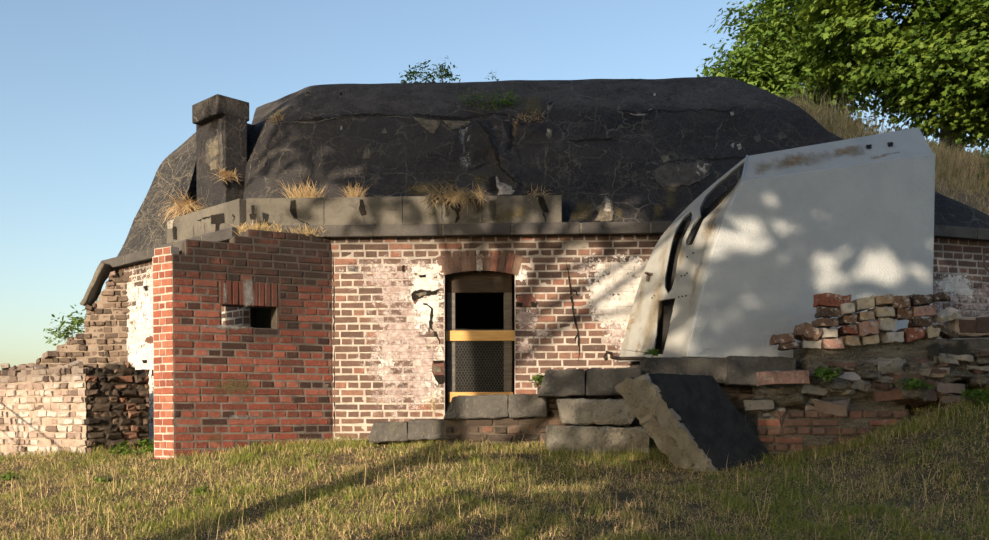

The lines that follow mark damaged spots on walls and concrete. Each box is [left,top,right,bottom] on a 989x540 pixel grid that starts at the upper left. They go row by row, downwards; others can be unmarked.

crack [123,135,235,252]
spalling [197,213,224,231]
crack [248,86,513,224]
spalling [488,176,515,195]
crack [523,86,770,206]
crack [423,303,440,344]